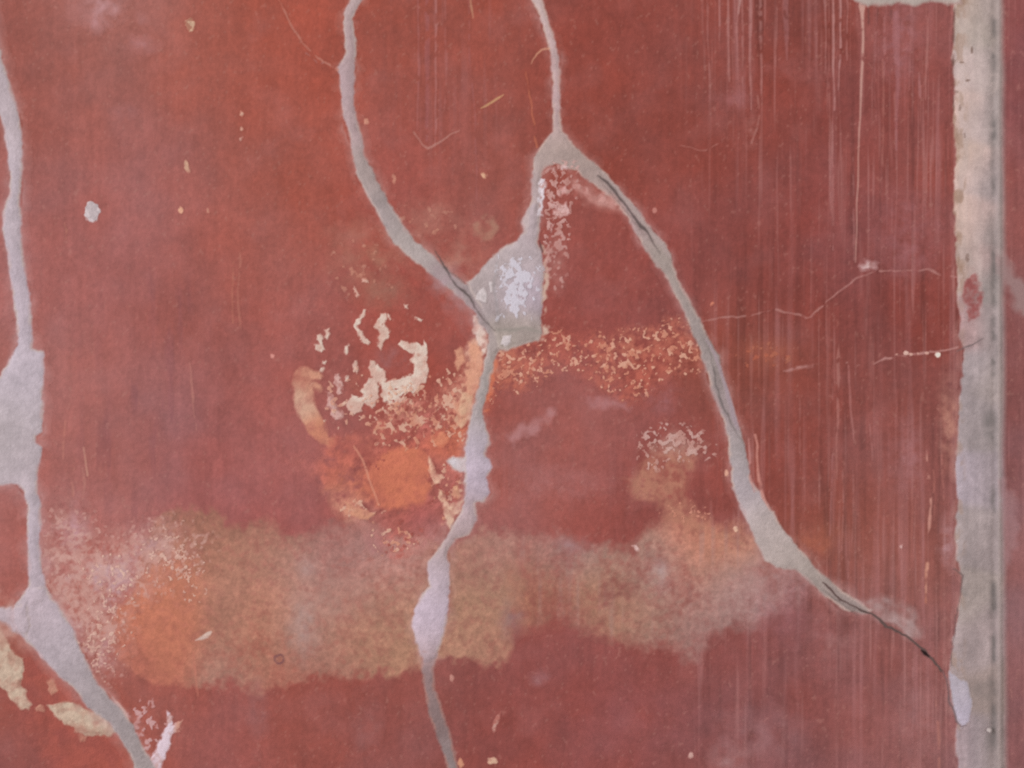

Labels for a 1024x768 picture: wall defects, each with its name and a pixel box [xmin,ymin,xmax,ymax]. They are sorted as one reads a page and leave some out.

crack [0,0,165,768]
crack [277,0,504,768]
peeling [278,277,700,570]
leakage [503,405,559,450]
crack [514,0,985,728]
peeling [0,626,123,768]
leakage [47,419,435,764]
leakage [440,462,874,768]
leakage [890,654,943,768]